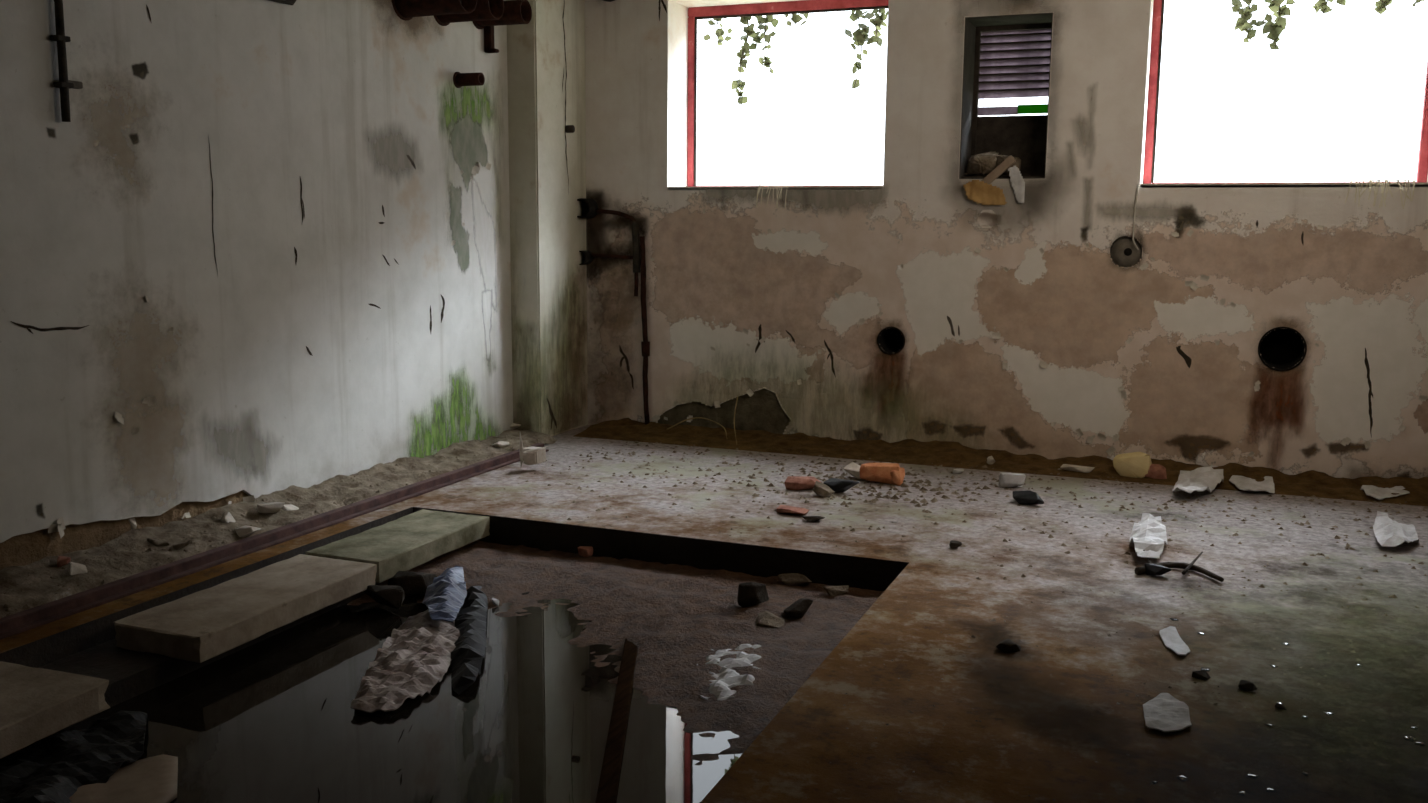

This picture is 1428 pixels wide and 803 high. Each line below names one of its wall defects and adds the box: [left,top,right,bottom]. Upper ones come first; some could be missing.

crack [10,321,89,334]
peeling [588,189,1428,477]
damp [413,376,462,449]
corrosion [865,355,904,420]
corrosion [1252,364,1302,463]
crack [1364,348,1373,438]
flaking render [0,491,255,570]